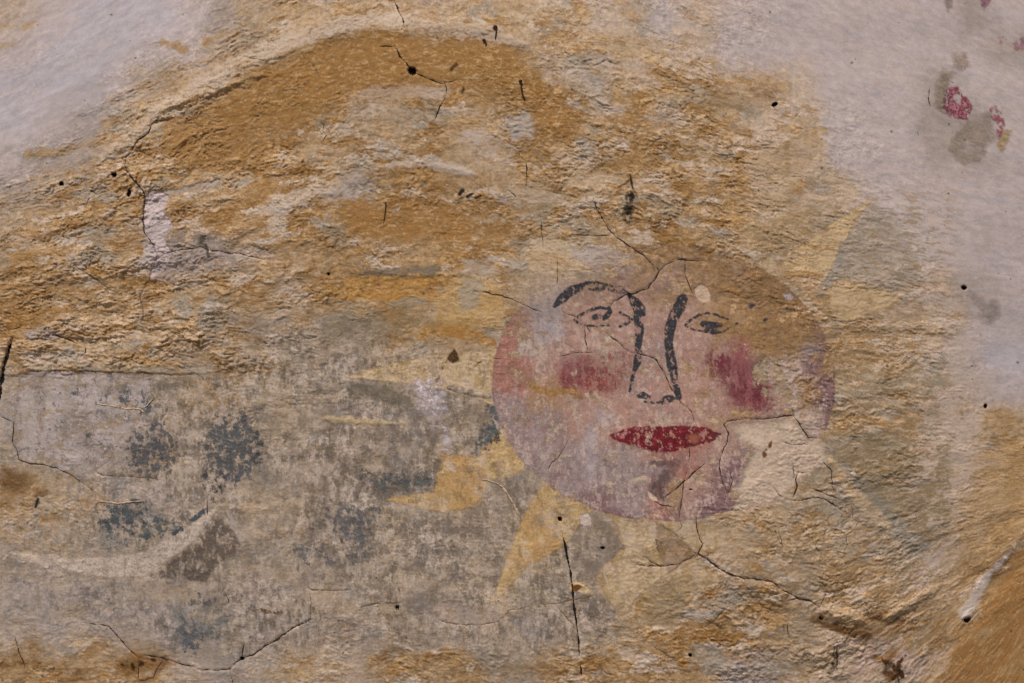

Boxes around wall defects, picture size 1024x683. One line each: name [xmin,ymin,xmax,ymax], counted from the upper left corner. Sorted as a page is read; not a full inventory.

crack [382,0,456,118]
crack [87,120,272,259]
spalling [143,179,234,281]
crack [573,198,700,305]
crack [562,314,694,419]
crack [487,480,520,516]
crack [638,409,857,635]
crack [85,582,341,682]
crack [550,534,612,676]